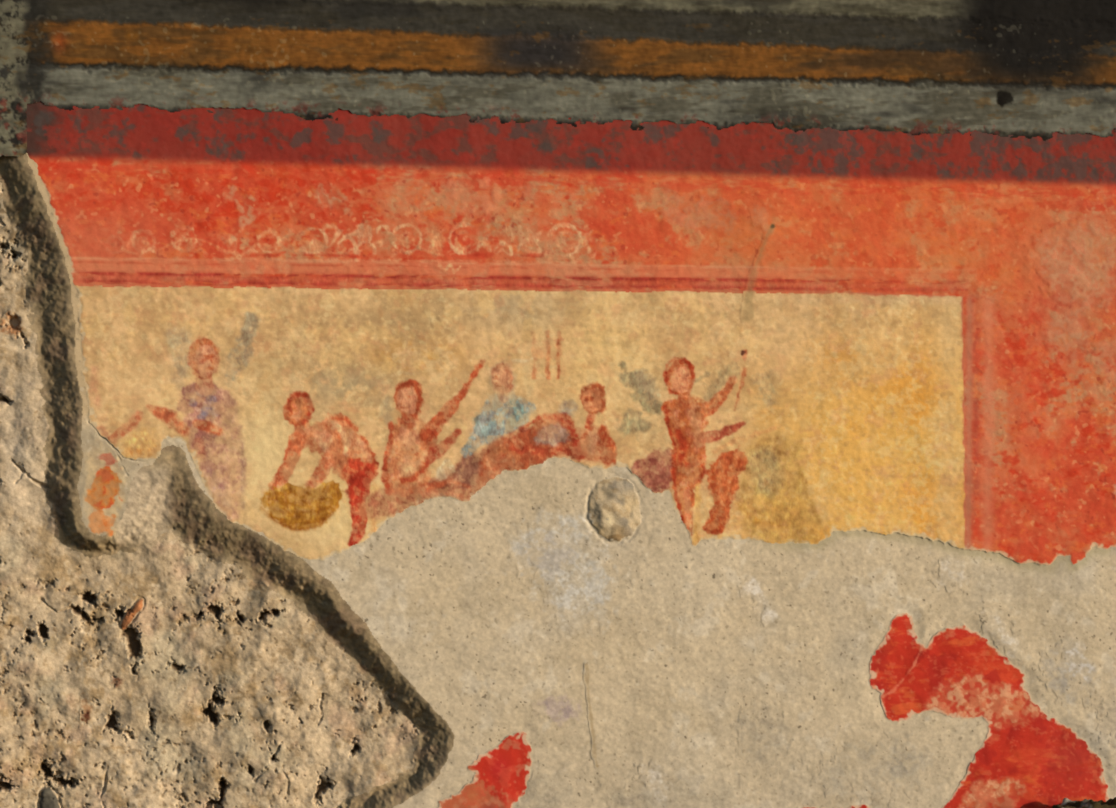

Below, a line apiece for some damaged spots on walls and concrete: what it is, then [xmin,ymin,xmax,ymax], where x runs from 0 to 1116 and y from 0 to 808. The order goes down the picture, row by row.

spalling [0,393,14,407]
peeling [79,438,131,539]
spalling [176,601,285,625]
spalling [22,621,50,646]
spalling [67,591,144,676]
spalling [102,704,156,738]
spalling [199,685,240,727]
peeling [919,669,1047,733]
spalling [39,759,76,790]
spalling [204,777,230,808]
spalling [311,772,336,806]
peeling [955,774,1029,808]